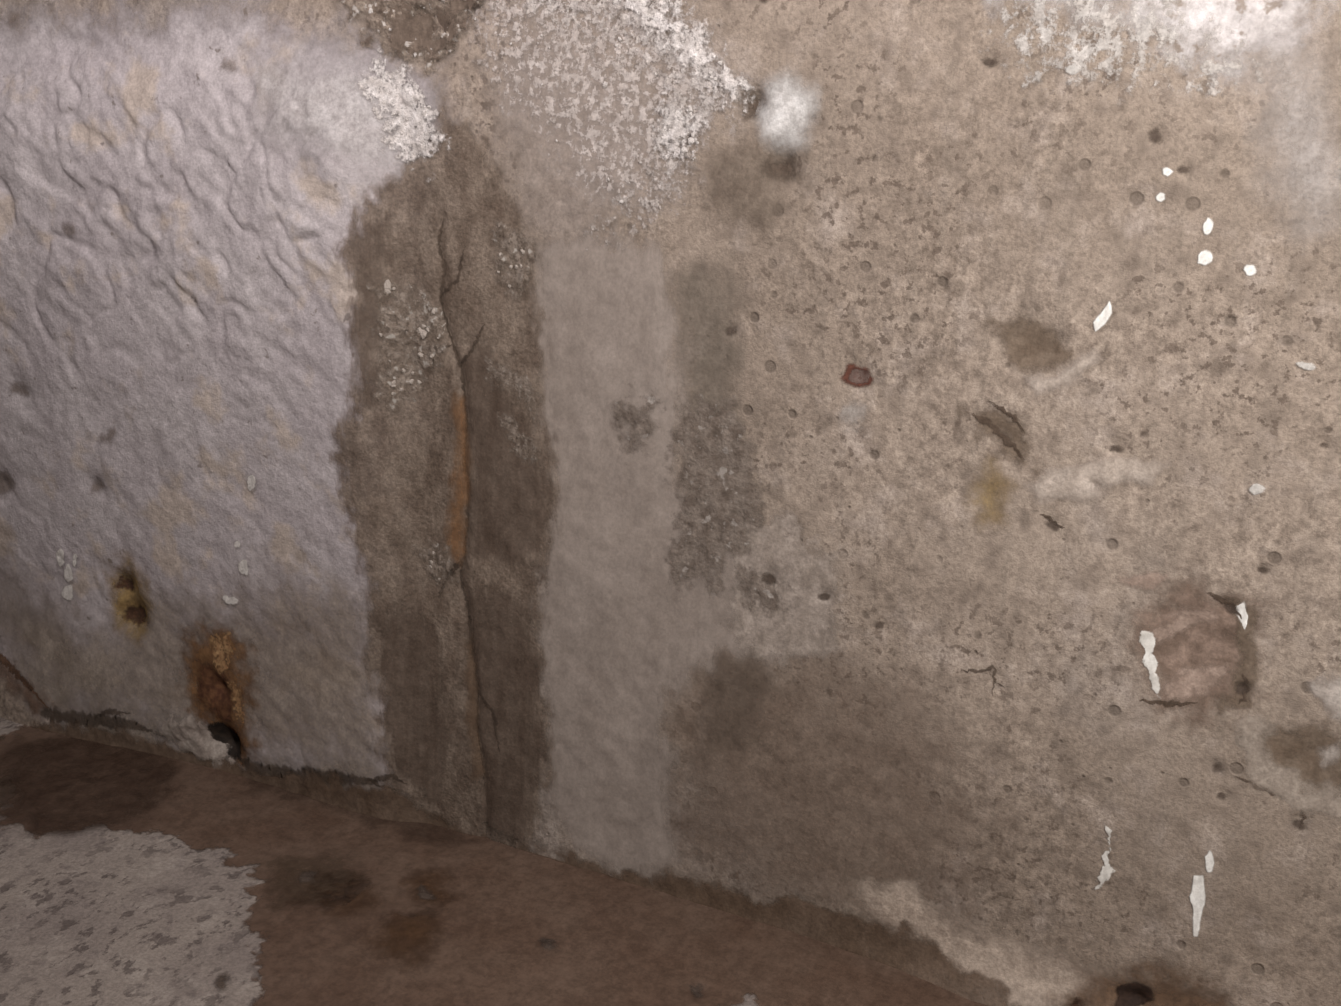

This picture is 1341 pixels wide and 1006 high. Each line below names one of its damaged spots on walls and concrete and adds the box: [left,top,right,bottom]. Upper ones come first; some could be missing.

rust [111,561,149,635]
rust [184,626,257,765]
crack [427,219,500,836]
leakage [0,0,1008,1006]
spalling [1121,573,1341,829]